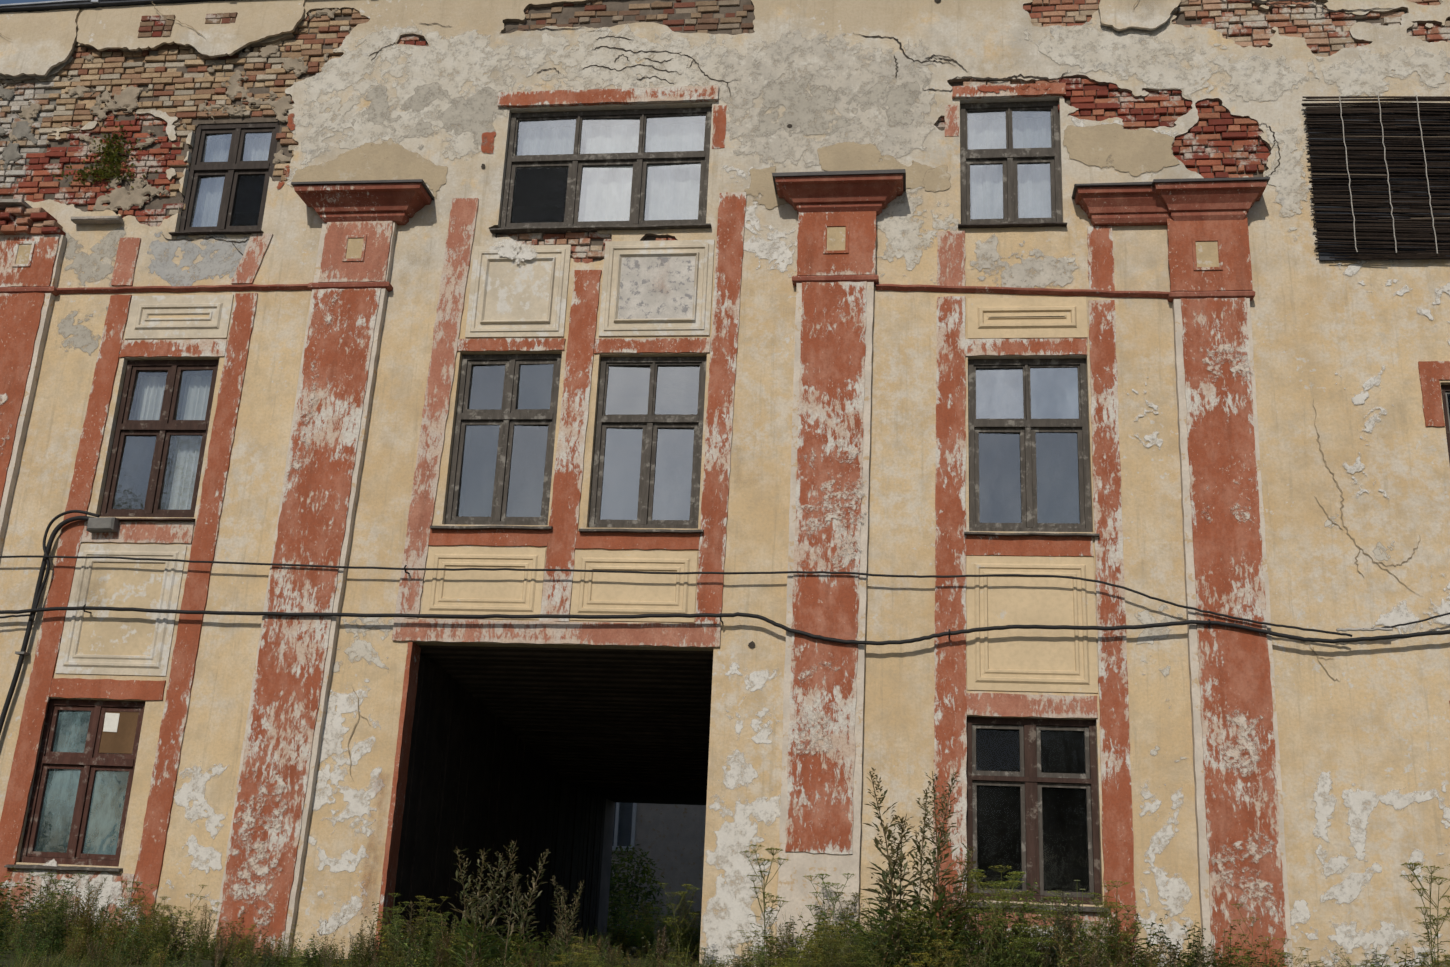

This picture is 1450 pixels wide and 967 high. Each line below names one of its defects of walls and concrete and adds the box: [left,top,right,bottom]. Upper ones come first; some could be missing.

crack [369,23,452,61]
crack [499,27,733,92]
flaking render [0,0,1450,237]
flaking render [491,232,612,264]
peeling [876,186,959,277]
peeling [970,234,1079,288]
crack [1313,398,1421,596]
peeling [1373,573,1450,634]
peeling [174,764,287,927]
peeling [307,617,394,935]
peeling [702,662,781,967]
peeling [1211,772,1450,967]